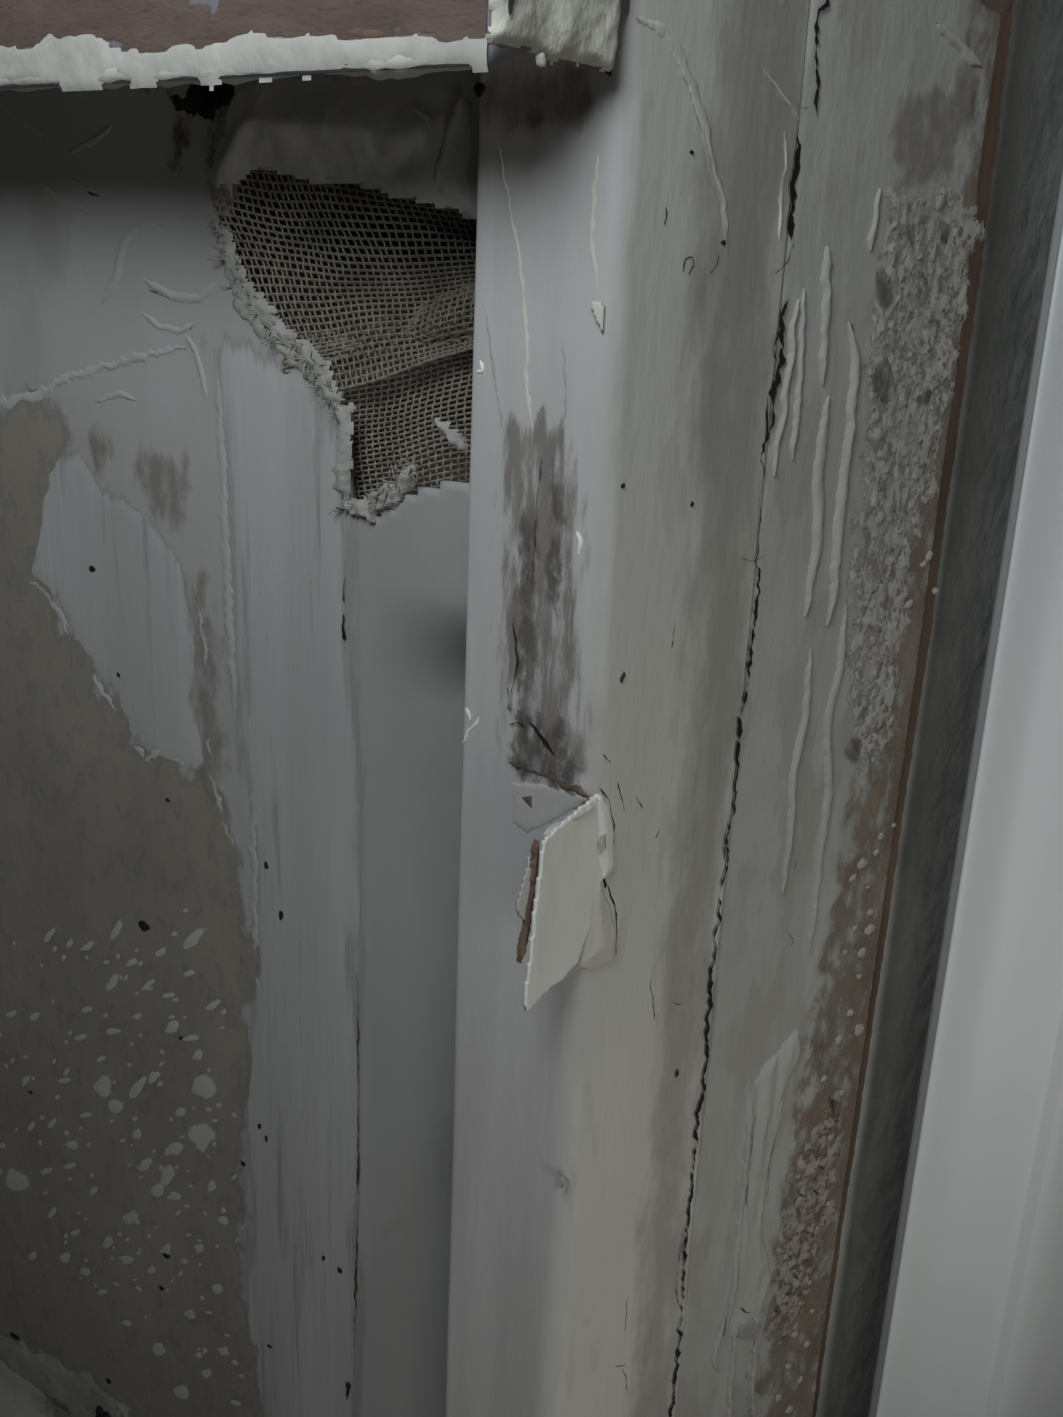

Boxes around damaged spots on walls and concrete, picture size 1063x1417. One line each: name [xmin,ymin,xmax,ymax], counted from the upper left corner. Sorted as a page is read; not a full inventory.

peeling [0,0,487,53]
spalling [196,148,484,523]
peeling [0,388,265,1417]
peeling [462,707,479,744]
damp [505,407,582,796]
peeling [516,783,642,1011]
crack [669,0,829,1417]